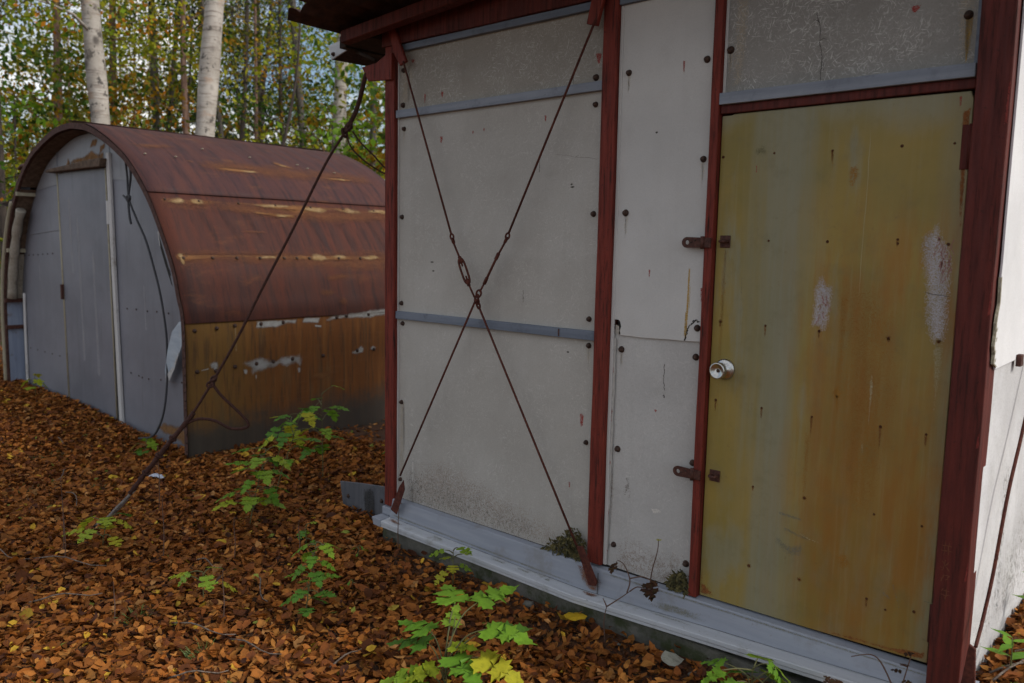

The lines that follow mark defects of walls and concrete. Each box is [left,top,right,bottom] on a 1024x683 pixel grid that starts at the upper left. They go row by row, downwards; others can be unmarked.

corrosion [161,198,385,225]
corrosion [174,253,381,264]
peeling [811,276,833,329]
peeling [921,227,955,405]
peeling [244,353,303,379]